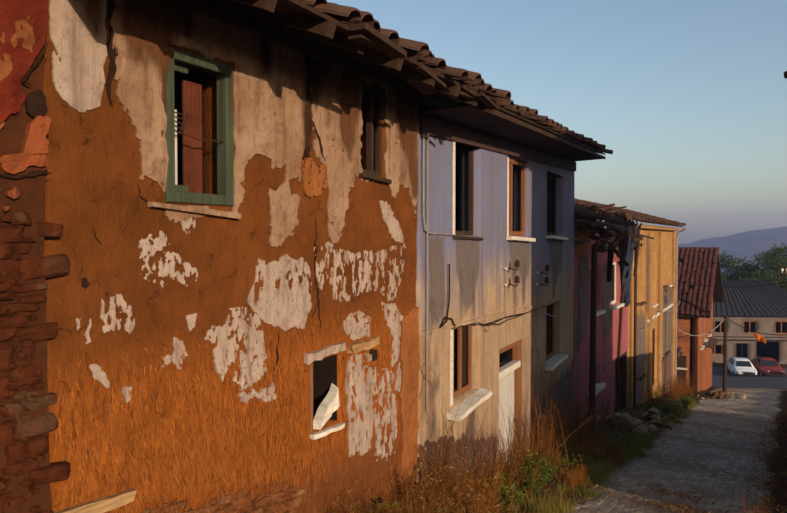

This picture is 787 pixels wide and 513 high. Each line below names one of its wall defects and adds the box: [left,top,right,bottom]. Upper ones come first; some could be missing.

peeling [0,0,169,193]
crack [106,0,118,106]
spalling [1,187,20,212]
peeling [138,230,198,288]
peeling [162,6,496,512]
peeling [76,294,135,344]